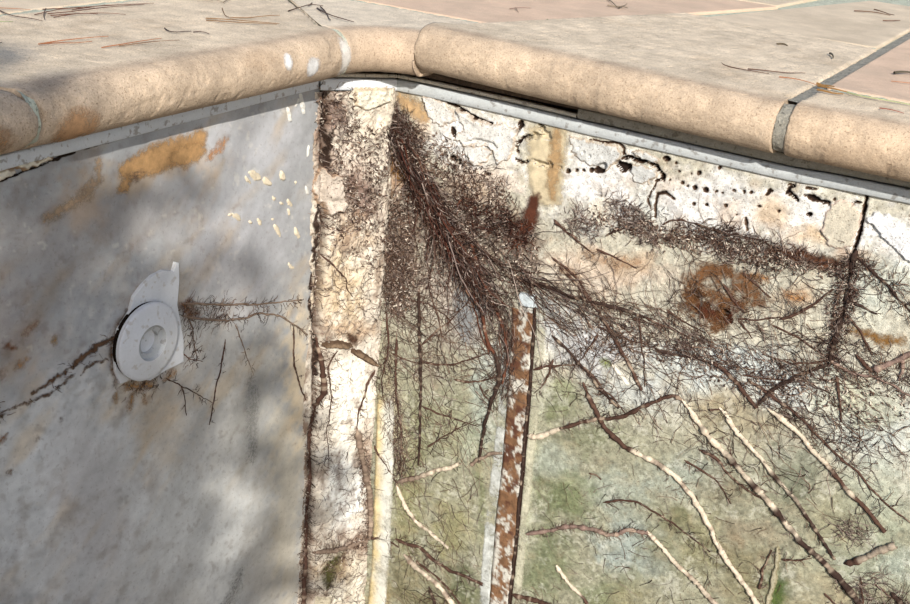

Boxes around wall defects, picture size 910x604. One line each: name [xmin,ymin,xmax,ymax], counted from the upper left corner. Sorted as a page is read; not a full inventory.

peeling [354,86,391,110]
spalling [0,143,107,182]
corrosion [118,128,226,193]
peeling [568,135,676,218]
corrosion [507,194,541,246]
crack [852,195,869,253]
corrosion [677,262,768,334]